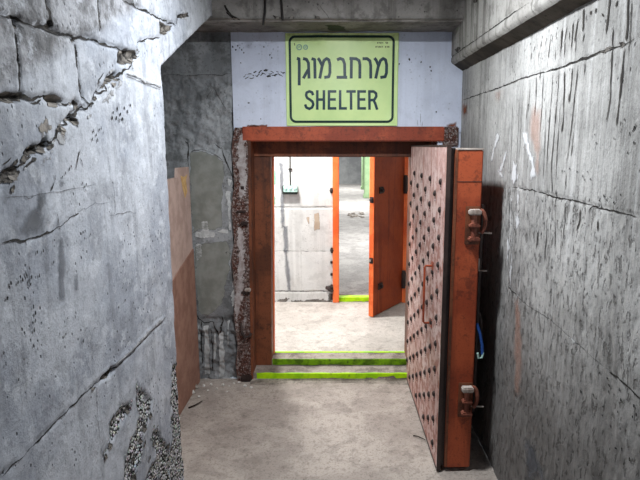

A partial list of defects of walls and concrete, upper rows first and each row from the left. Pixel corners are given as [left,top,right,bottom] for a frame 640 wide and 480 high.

crack [0,0,177,193]
leakage [499,65,585,184]
crack [464,38,636,100]
leakage [534,0,617,122]
leakage [616,0,632,125]
crack [3,213,79,243]
leakage [507,216,520,284]
crack [512,179,636,217]
crack [109,319,163,369]
leakage [198,320,230,377]
crack [609,372,640,399]
crack [4,381,99,475]